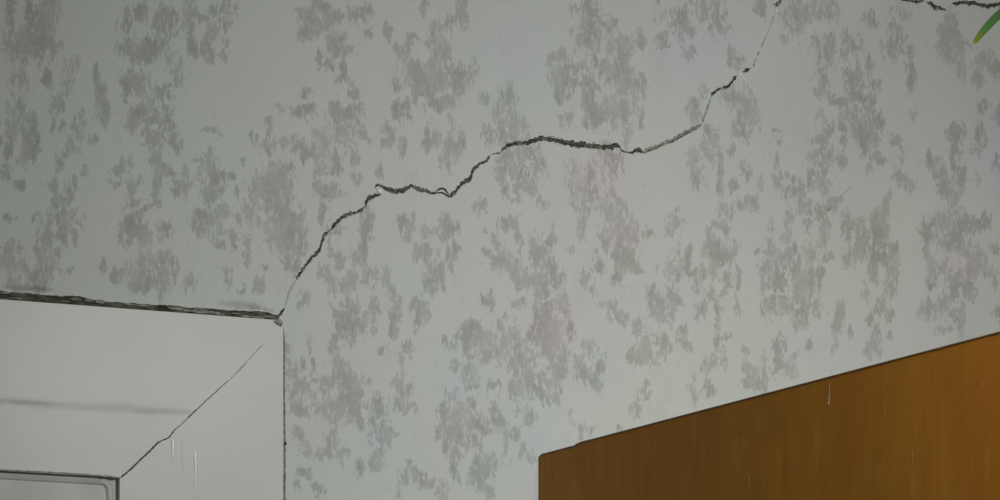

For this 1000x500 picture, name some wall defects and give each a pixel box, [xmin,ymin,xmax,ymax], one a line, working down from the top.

crack [0,0,782,500]
crack [902,0,1000,12]